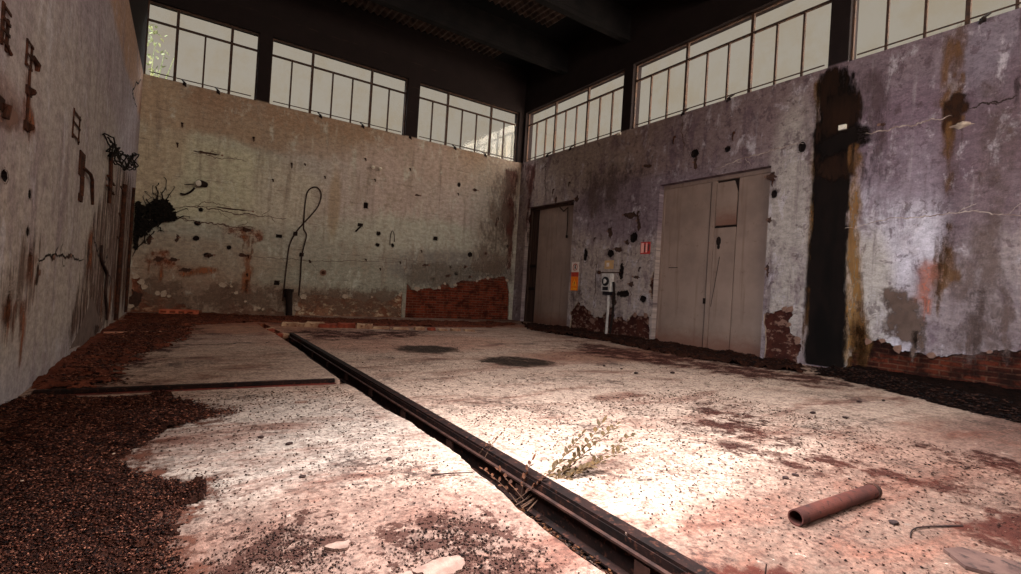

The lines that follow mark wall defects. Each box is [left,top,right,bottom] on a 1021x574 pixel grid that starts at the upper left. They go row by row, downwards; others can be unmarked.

crack [867,95,1018,134]
leakage [802,66,886,367]
crack [847,203,1021,228]
leakage [1,237,41,363]
crack [39,236,111,286]
rust [229,226,263,295]
flaking render [219,251,511,320]
flaking render [570,211,654,339]
flaking render [764,306,802,363]
flaking render [845,338,1021,389]